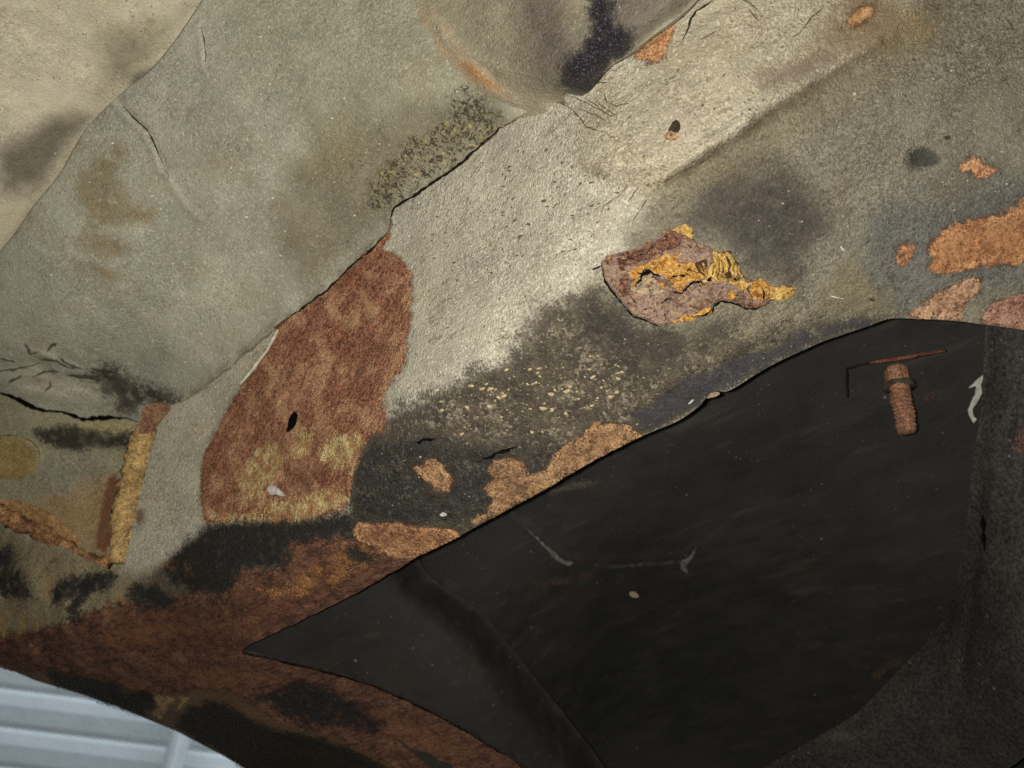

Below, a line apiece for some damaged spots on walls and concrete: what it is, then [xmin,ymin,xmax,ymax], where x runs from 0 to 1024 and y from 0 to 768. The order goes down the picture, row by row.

rust [634,25,674,65]
water stain [366,85,501,208]
peeling [460,148,620,300]
rust [592,224,796,327]
rust [894,198,1024,330]
crack [0,392,139,422]
water stain [346,259,899,536]
rust [0,231,520,768]
rust [469,421,642,525]